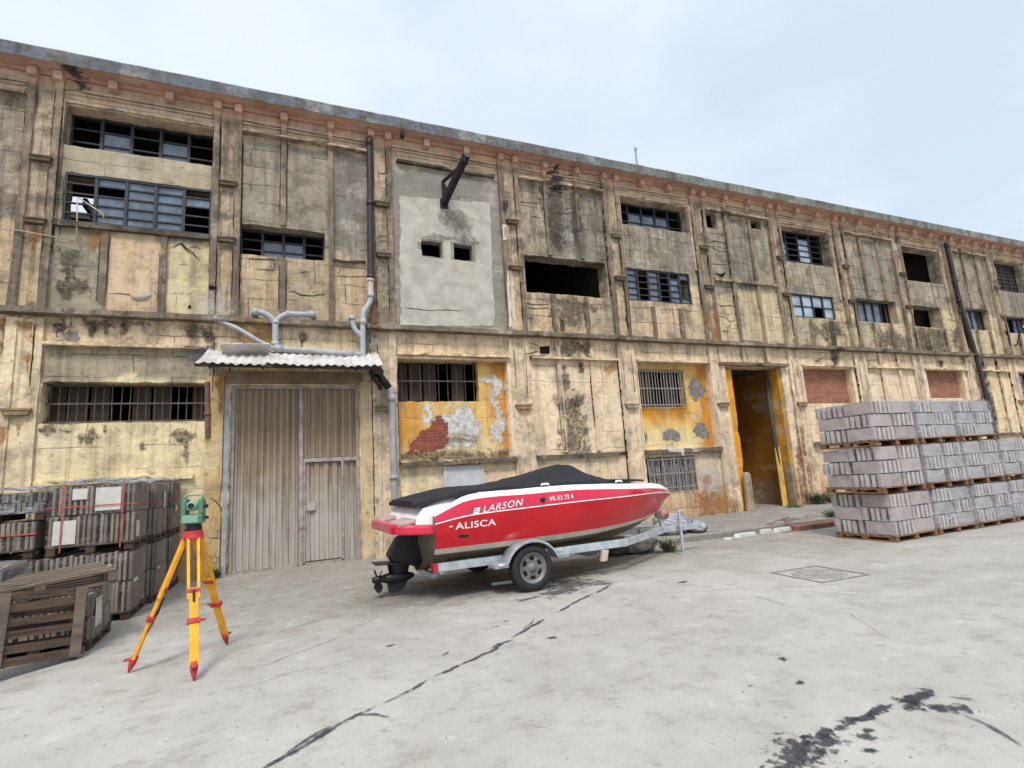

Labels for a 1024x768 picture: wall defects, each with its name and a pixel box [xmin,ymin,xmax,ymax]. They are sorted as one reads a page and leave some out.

damp [539,164,583,253]
damp [55,250,89,300]
peeling [406,374,506,455]
mould [548,298,602,457]
spalling [660,428,684,455]
spalling [688,377,706,401]
spalling [693,422,710,440]
crack [263,593,593,768]